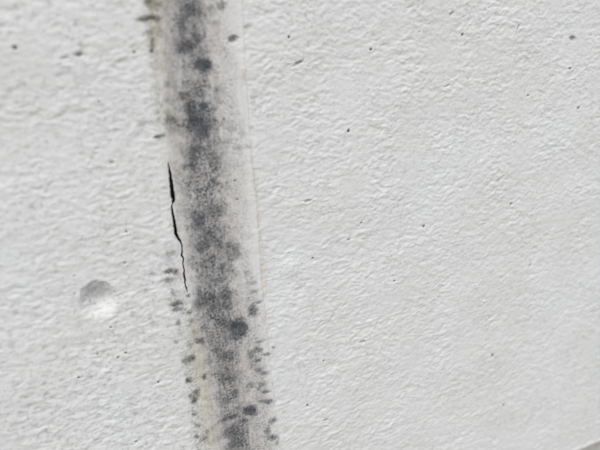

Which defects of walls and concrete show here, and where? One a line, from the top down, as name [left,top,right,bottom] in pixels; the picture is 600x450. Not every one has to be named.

crack [165,159,190,296]
mould [178,54,248,341]
mould [222,406,258,446]